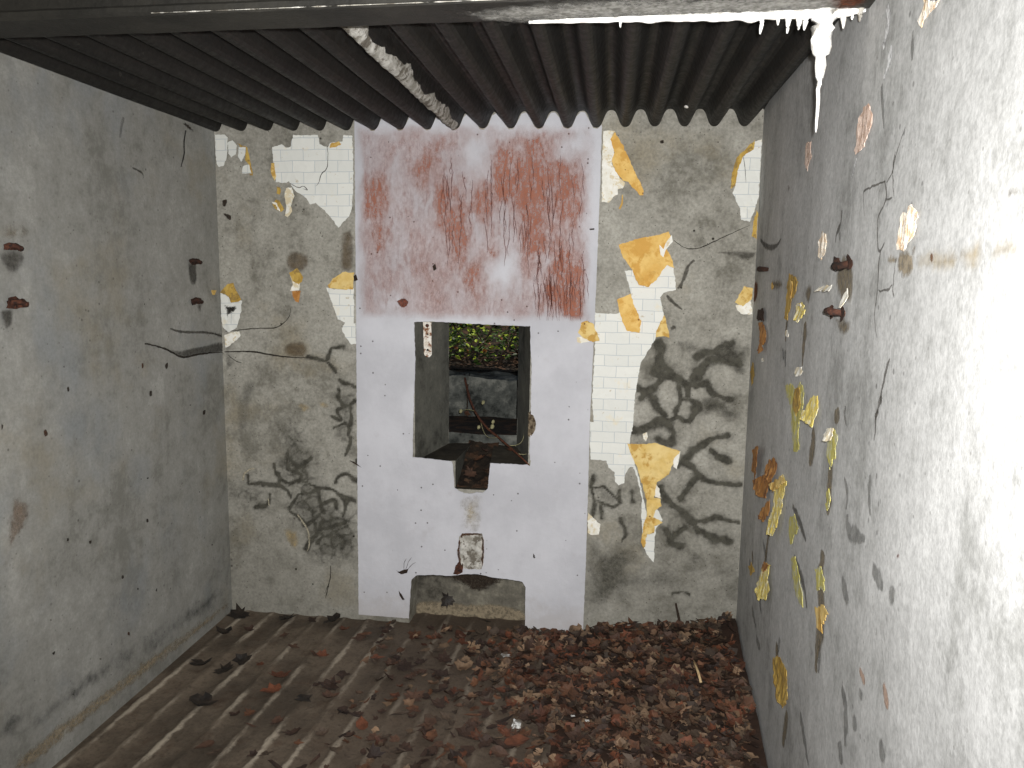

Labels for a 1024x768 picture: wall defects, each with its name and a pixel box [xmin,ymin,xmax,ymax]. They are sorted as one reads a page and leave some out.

water stain [183,0,866,133]
peeling [228,140,252,174]
peeling [272,187,284,212]
crack [835,129,905,336]
spalling [896,204,919,251]
crack [145,308,310,363]
peeling [224,332,241,348]
spalling [453,533,484,575]
peeling [748,446,829,673]